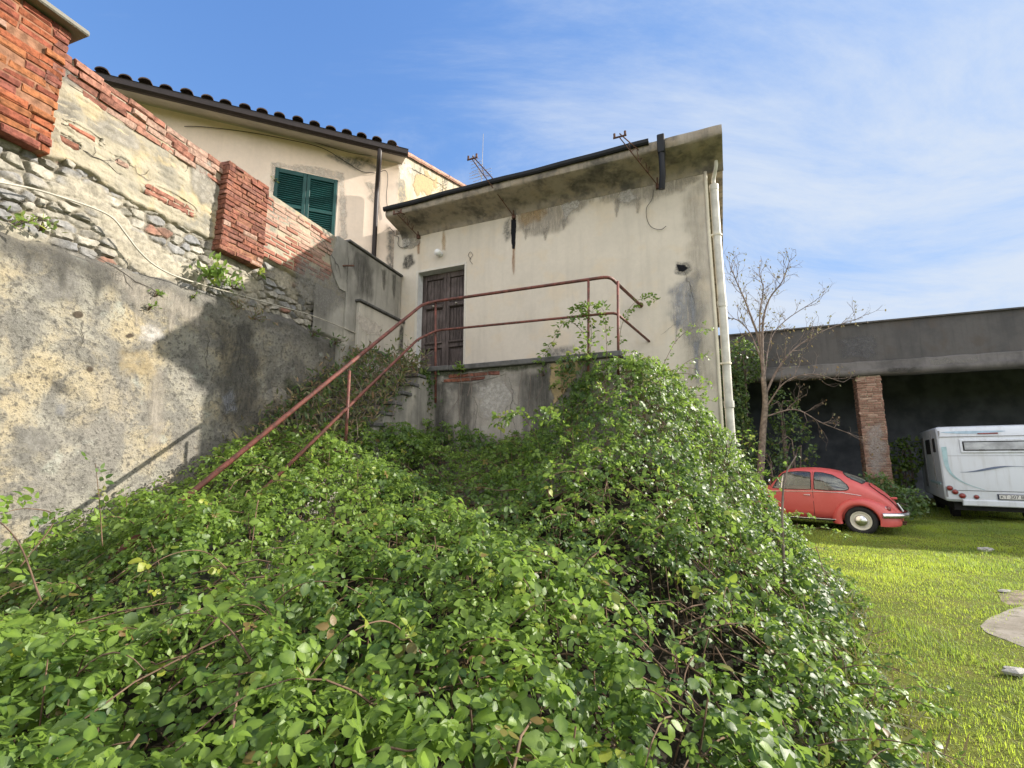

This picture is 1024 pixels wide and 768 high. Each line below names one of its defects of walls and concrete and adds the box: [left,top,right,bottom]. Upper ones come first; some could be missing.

flaking render [52,116,135,173]
peeling [399,162,438,196]
flaking render [139,181,200,217]
spalling [675,263,691,274]
leakage [672,276,700,374]
flaking render [441,370,507,385]